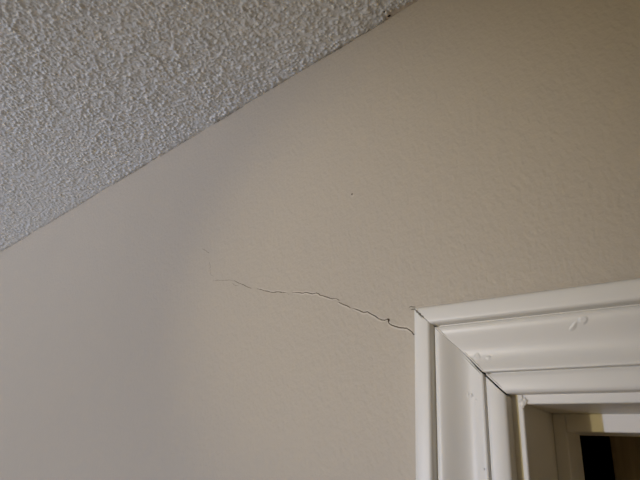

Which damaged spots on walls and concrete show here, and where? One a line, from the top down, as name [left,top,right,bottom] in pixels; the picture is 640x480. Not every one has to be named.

crack [203,249,508,395]